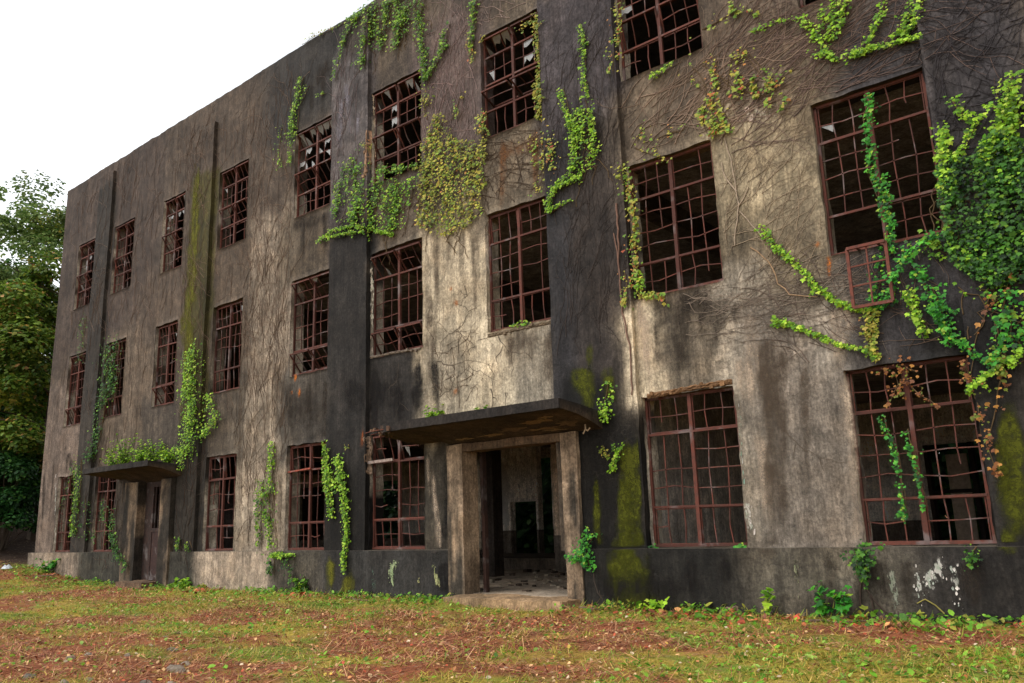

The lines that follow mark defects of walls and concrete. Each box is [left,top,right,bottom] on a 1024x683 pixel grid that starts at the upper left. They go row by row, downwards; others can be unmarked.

damp [737,341,786,503]
damp [844,388,853,440]
peeling [913,556,961,607]